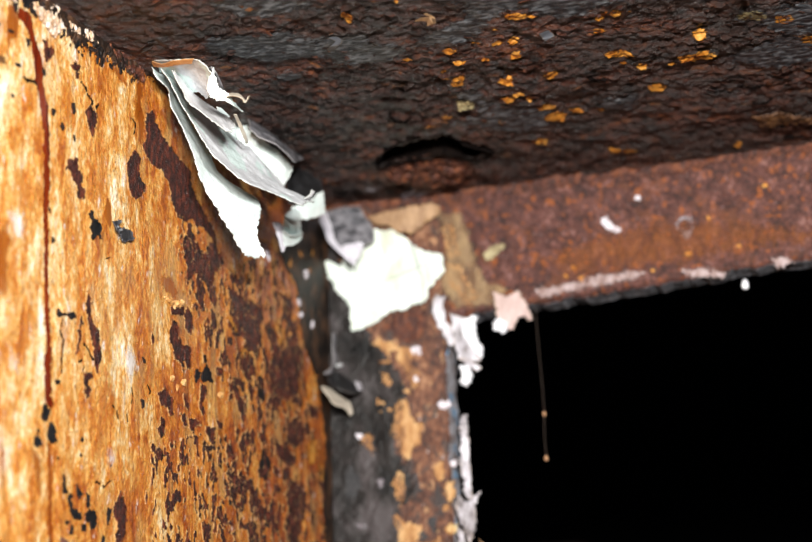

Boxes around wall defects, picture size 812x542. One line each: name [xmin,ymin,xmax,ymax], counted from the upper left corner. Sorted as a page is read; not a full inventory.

corrosion [39,0,154,144]
corrosion [498,75,583,122]
corrosion [692,28,707,41]
corrosion [7,4,68,409]
spalling [64,157,86,200]
corrosion [329,141,812,308]
peeling [33,403,58,448]
spalling [56,290,102,399]
corrosion [149,215,326,542]
peeling [126,58,483,542]
peeling [492,290,533,334]
peeling [60,474,128,542]